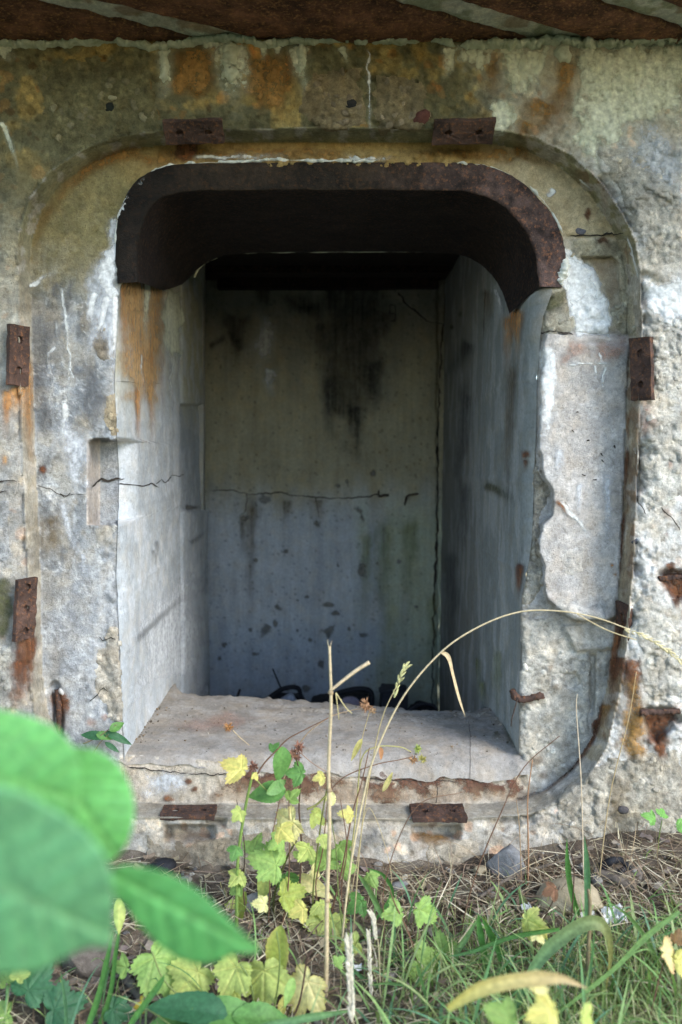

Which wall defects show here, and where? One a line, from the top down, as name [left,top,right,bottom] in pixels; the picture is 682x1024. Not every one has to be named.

corrosion [244,55,294,107]
corrosion [66,144,339,187]
corrosion [121,282,164,417]
crack [0,474,184,497]
crack [213,490,390,517]
spalling [519,453,594,770]
corrosion [13,637,36,693]
corrosion [610,615,647,757]
spalling [631,584,682,699]
corrosion [360,772,523,803]